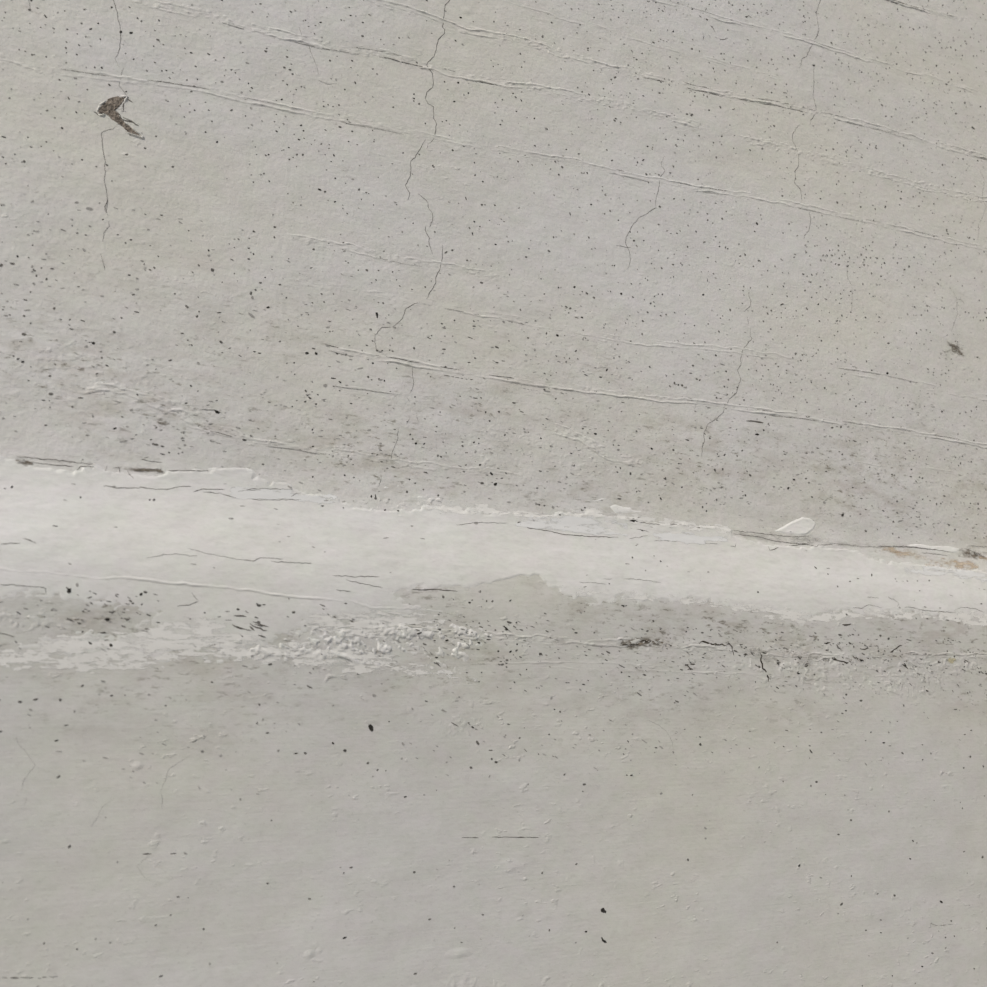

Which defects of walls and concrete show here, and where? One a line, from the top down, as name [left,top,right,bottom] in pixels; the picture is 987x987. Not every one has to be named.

spalling [95,95,144,139]
crack [375,0,450,350]
leakage [0,608,461,680]